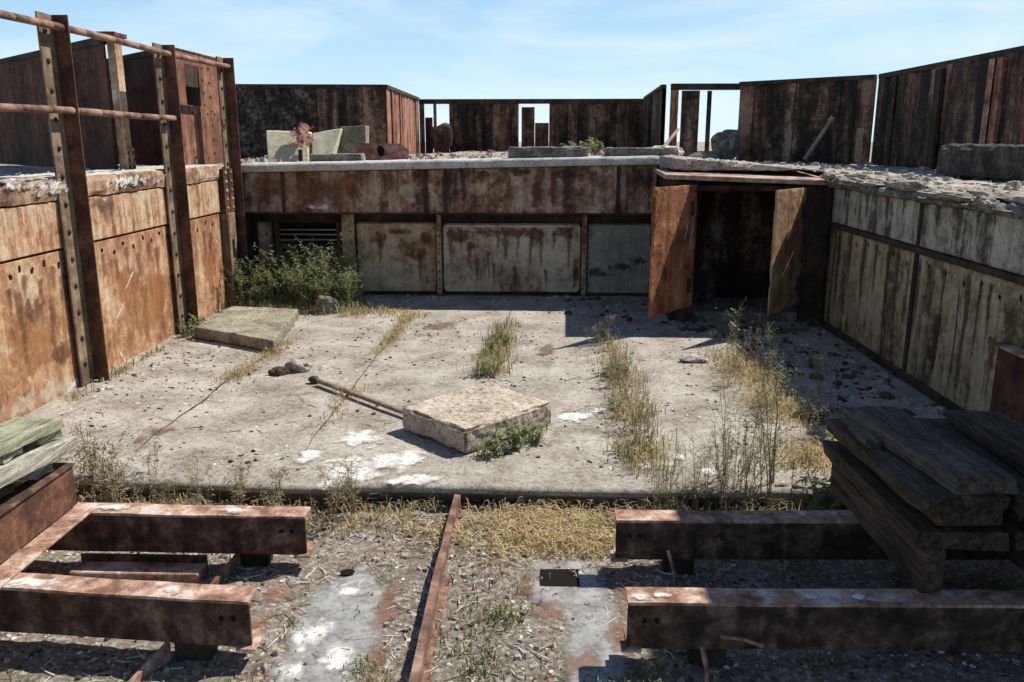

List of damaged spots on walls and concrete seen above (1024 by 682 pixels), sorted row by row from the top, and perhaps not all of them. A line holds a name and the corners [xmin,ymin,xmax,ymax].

peeling [0,176,68,197]
rust [96,198,113,221]
peeling [109,174,165,188]
rust [531,169,571,207]
spalling [820,171,1005,210]
rust [203,231,214,292]
rust [375,228,431,274]
rust [446,227,573,263]
rust [102,237,173,332]
rust [8,258,72,374]